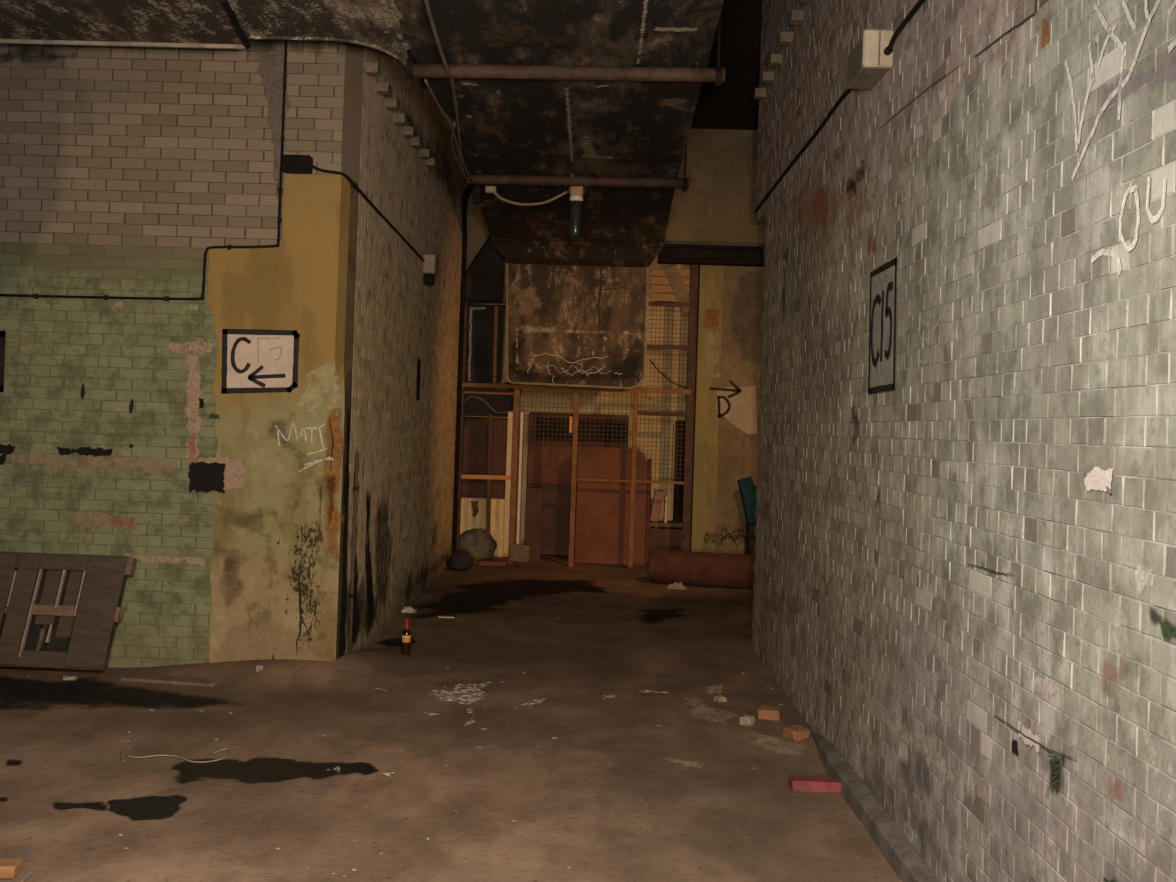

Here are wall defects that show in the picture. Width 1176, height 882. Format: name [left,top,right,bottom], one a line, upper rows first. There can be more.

peeling [139,341,248,490]
corrosion [318,409,343,553]
spalling [1083,467,1113,495]
water stain [277,522,322,648]
crack [994,714,1075,759]